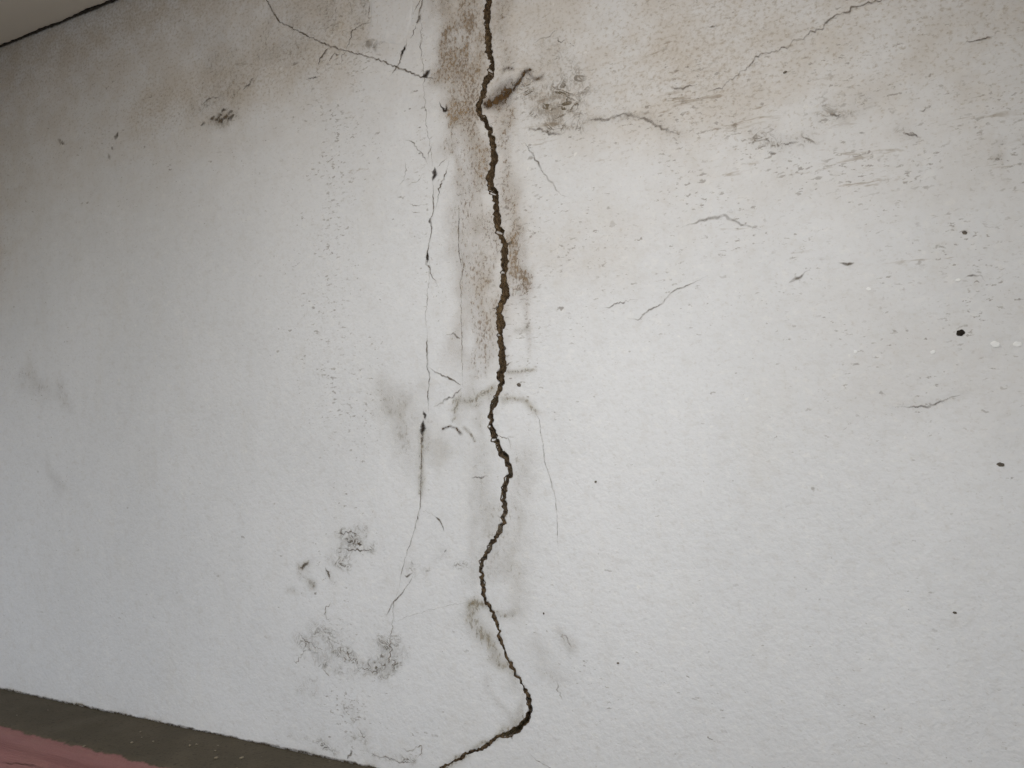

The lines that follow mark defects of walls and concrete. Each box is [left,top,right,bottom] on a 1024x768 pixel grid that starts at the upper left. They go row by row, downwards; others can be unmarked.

crack [266,0,431,79]
crack [411,127,446,280]
water stain [430,0,490,232]
water stain [483,108,532,292]
water stain [455,244,503,368]
crack [439,0,533,768]